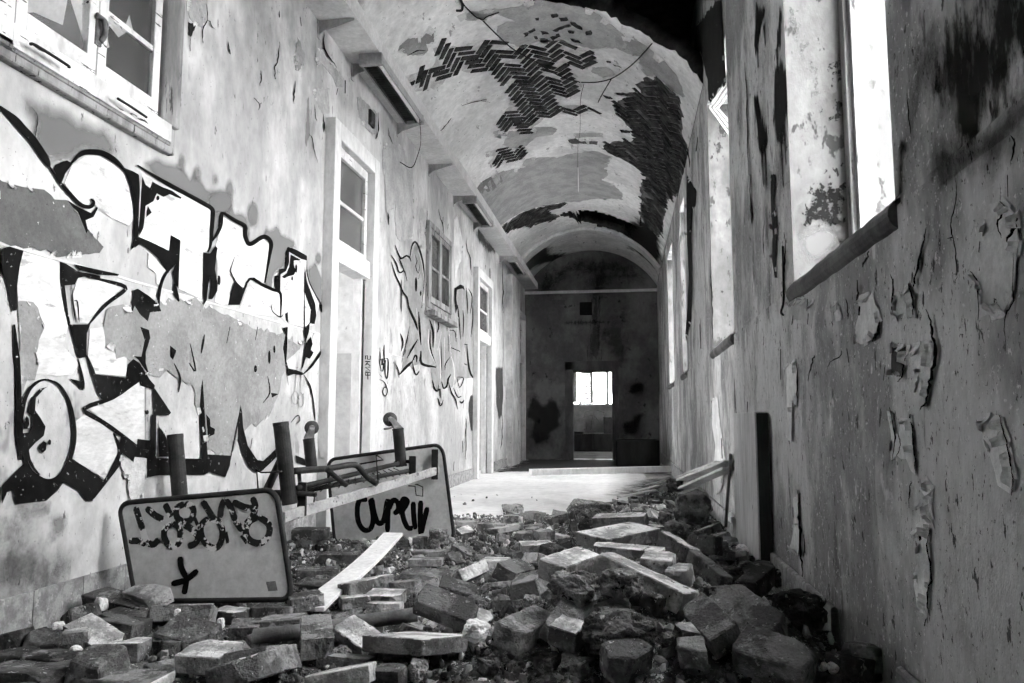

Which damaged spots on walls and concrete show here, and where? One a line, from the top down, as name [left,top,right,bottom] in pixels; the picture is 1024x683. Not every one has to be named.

water stain [922,0,1024,187]
flaking render [0,180,103,258]
peeling [104,297,305,455]
water stain [527,398,560,443]
flaking render [398,0,697,341]
peeling [784,359,798,441]
crack [797,490,805,577]
crack [745,72,1018,503]
peeling [853,282,916,346]
peeling [886,340,935,617]
peeling [968,196,1023,320]
peeling [976,412,1018,493]